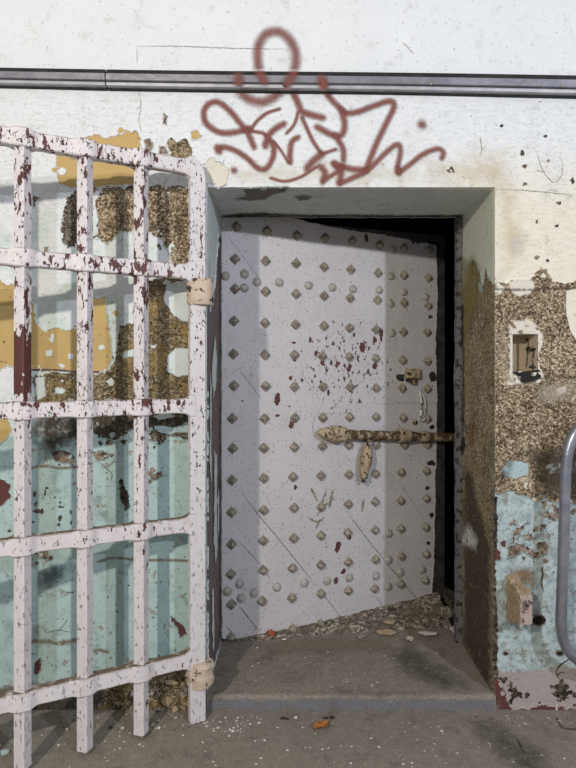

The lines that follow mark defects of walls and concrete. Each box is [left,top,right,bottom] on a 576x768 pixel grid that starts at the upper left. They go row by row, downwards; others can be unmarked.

peeling [84,127,203,158]
peeling [51,155,77,249]
peeling [93,162,134,246]
peeling [149,183,188,263]
peeling [0,278,14,371]
peeling [31,302,77,402]
peeling [93,296,134,400]
peeling [148,278,188,399]
peeling [0,419,13,445]
peeling [93,415,134,466]
peeling [149,413,188,449]
peeling [461,255,576,710]